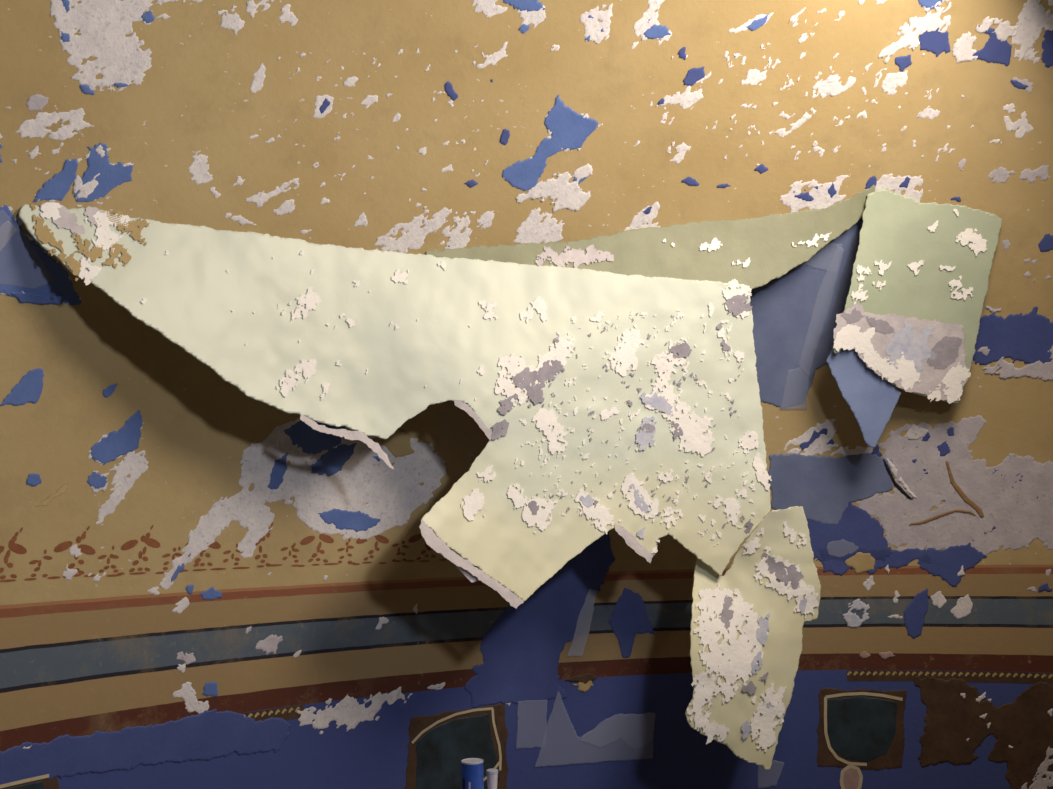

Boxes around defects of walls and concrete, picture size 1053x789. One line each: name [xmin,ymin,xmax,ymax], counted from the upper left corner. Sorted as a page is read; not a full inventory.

peeling [50,0,202,95]
peeling [217,0,298,35]
peeling [250,62,266,94]
peeling [631,0,672,49]
peeling [650,47,723,125]
peeling [724,0,1053,161]
peeling [15,94,94,159]
peeling [0,140,1053,770]
peeling [914,675,1053,789]